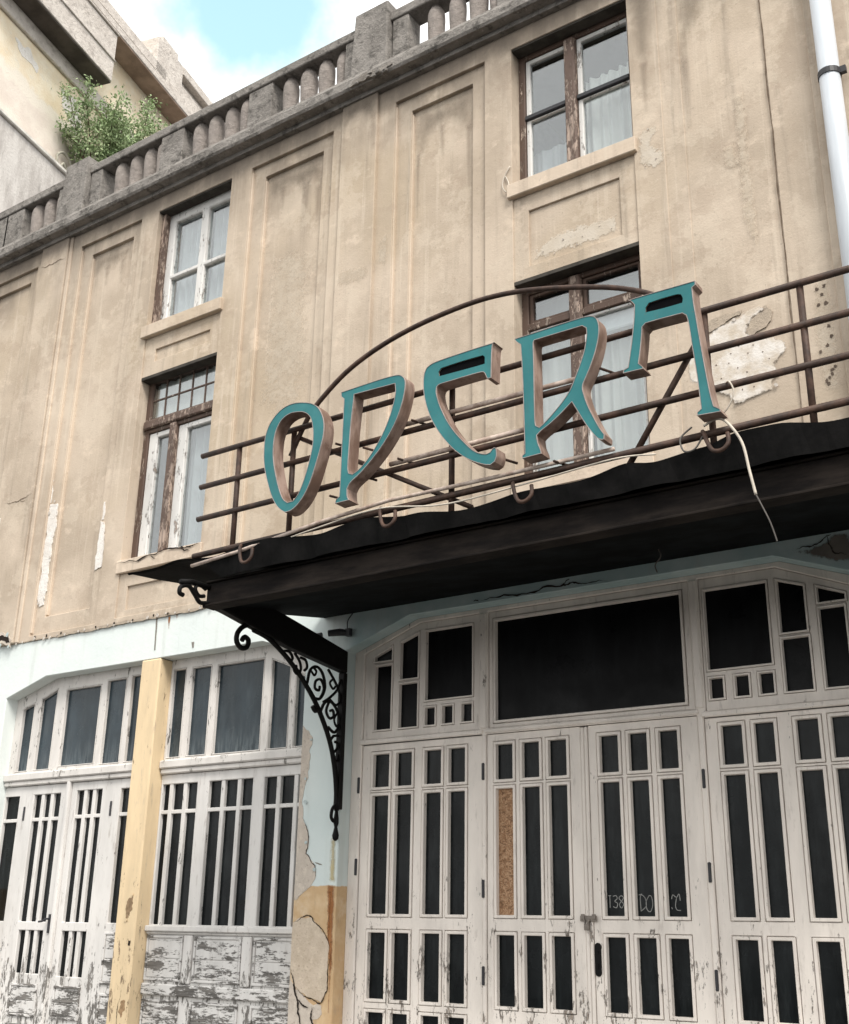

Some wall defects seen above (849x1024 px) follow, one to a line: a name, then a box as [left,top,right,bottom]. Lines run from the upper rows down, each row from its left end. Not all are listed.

peeling [535,214,617,259]
peeling [689,358,698,383]
peeling [708,305,786,404]
spalling [37,480,58,607]
spalling [94,502,106,571]
crack [474,579,602,601]
peeling [294,726,316,900]
peeling [287,915,331,1024]